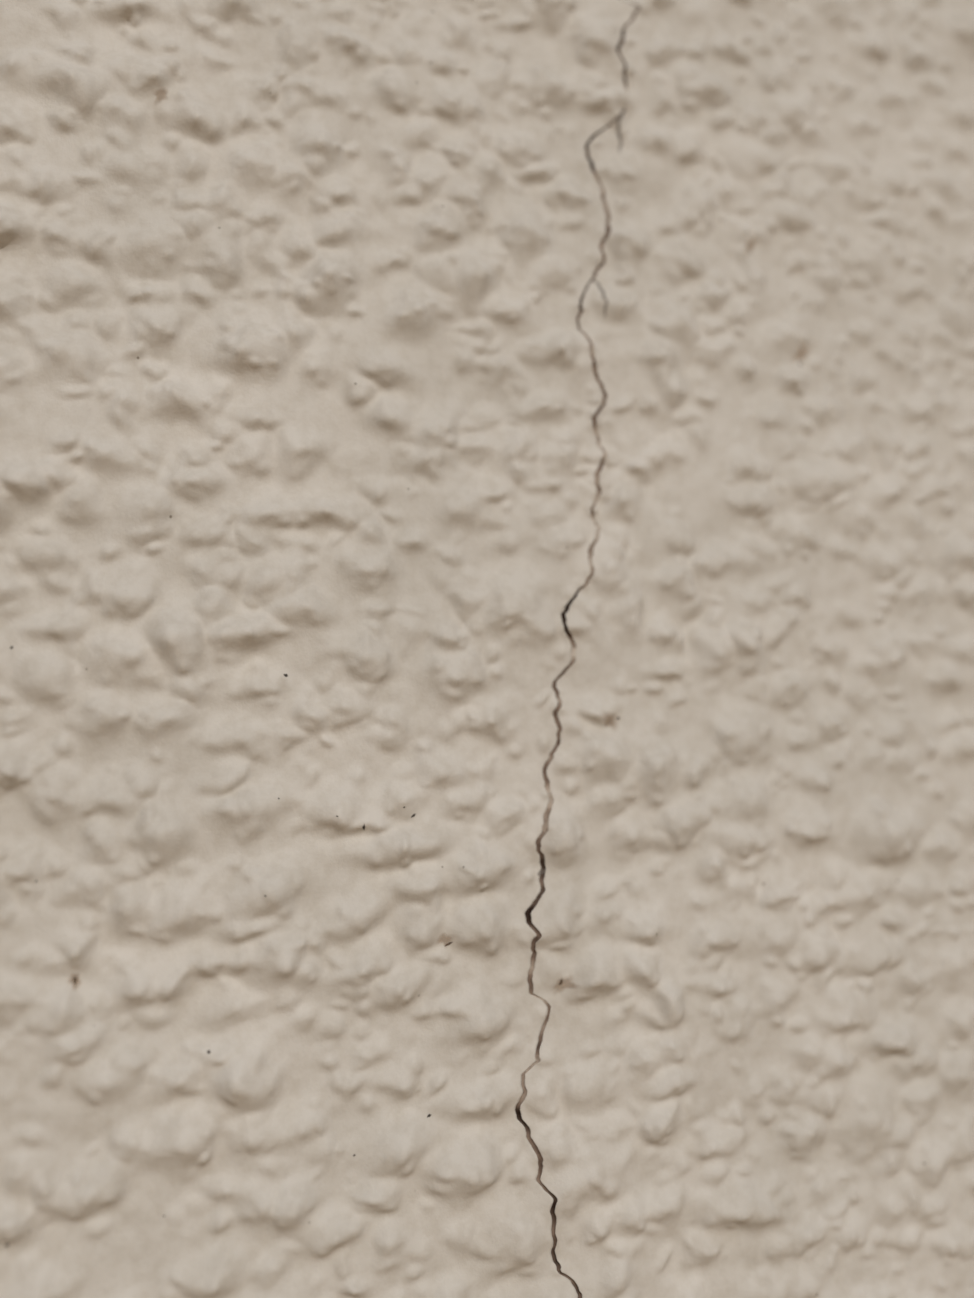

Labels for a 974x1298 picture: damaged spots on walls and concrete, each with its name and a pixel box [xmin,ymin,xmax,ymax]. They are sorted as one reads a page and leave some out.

crack [515,0,641,1298]